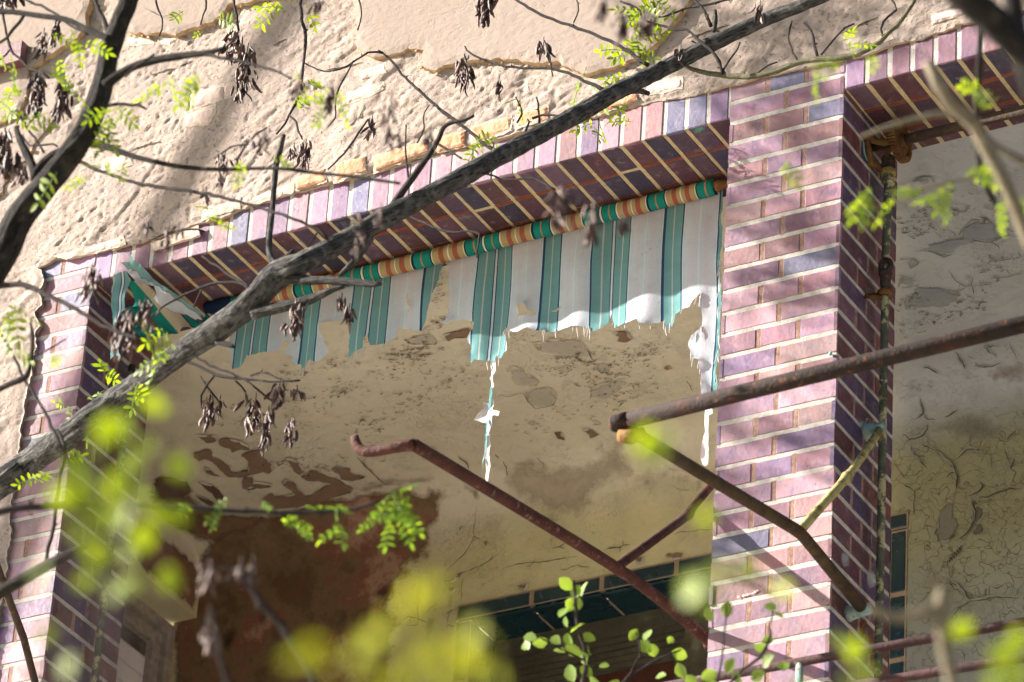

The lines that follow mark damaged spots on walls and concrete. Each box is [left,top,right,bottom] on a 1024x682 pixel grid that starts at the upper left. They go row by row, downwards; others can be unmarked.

flaking render [126,0,275,47]
flaking render [346,0,693,104]
flaking render [183,81,241,128]
flaking render [597,76,684,115]
flaking render [150,104,549,251]
flaking render [52,236,126,260]
peeling [897,255,1004,333]
peeling [153,273,491,510]
peeling [506,330,672,440]
crack [925,343,1017,374]
crack [894,401,1021,539]
crack [948,580,1017,617]